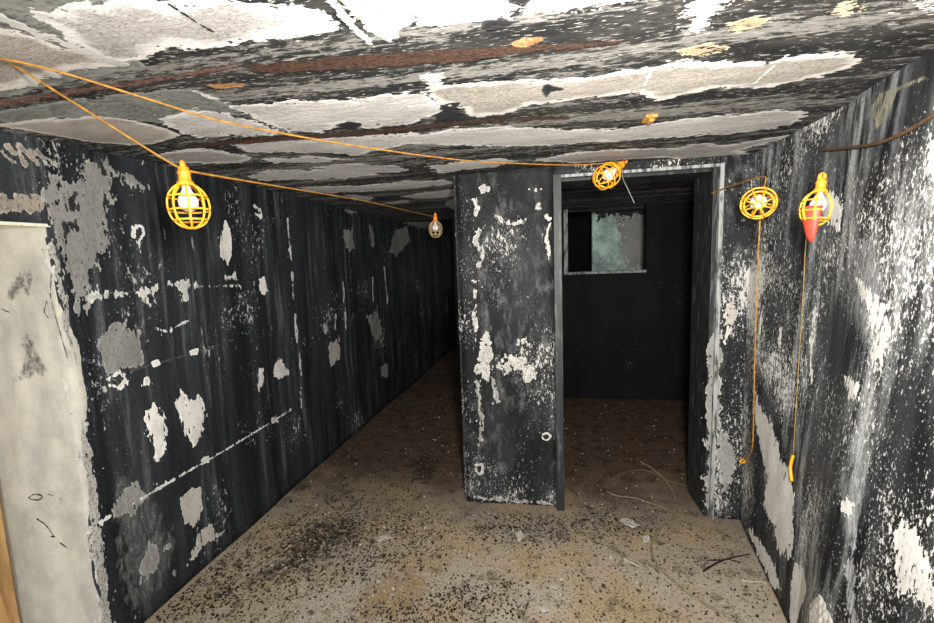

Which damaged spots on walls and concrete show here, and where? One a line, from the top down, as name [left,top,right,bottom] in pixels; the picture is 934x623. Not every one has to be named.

rust [0,37,619,108]
peeling [0,0,866,214]
peeling [218,220,232,265]
peeling [471,184,490,268]
peeling [0,142,150,623]
peeling [144,402,168,462]
peeling [174,389,205,448]
peeling [472,280,539,447]
peeling [700,300,740,509]
peeling [180,487,225,567]
peeling [748,392,806,623]
peeling [890,514,934,617]